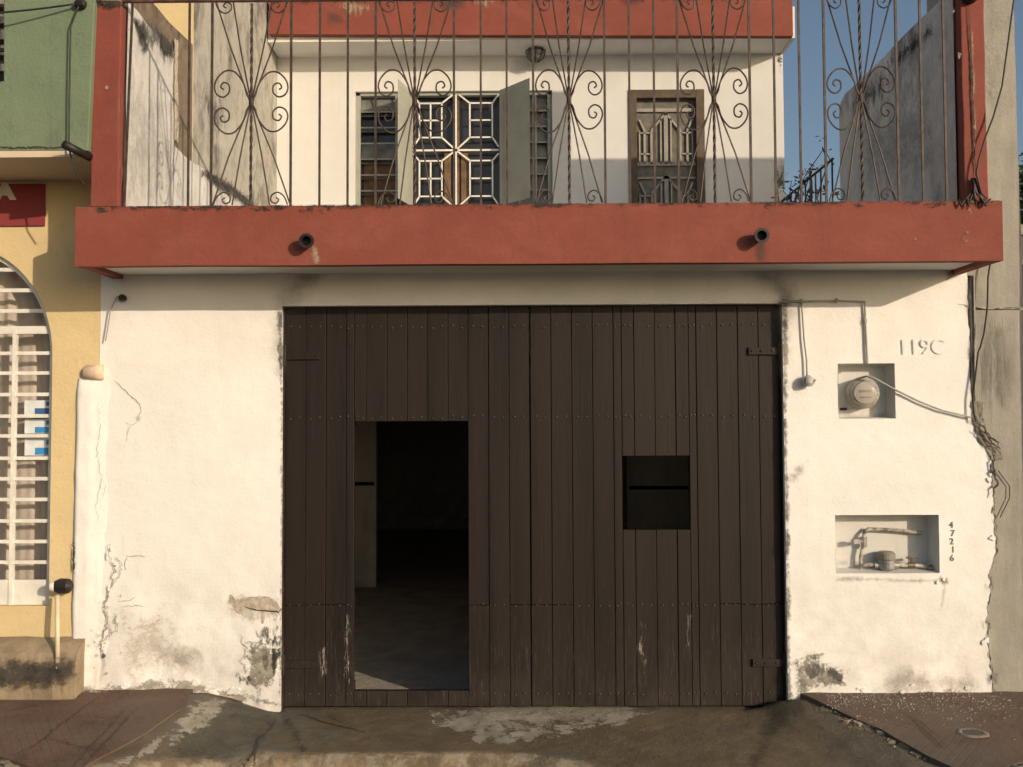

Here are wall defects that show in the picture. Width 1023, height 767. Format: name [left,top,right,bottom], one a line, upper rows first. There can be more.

leakage [135,18,174,64]
spalling [970,401,1004,692]
flaking render [229,594,282,624]
leakage [0,657,74,689]
crack [0,547,145,767]
leakage [237,626,283,690]
leakage [767,636,846,735]